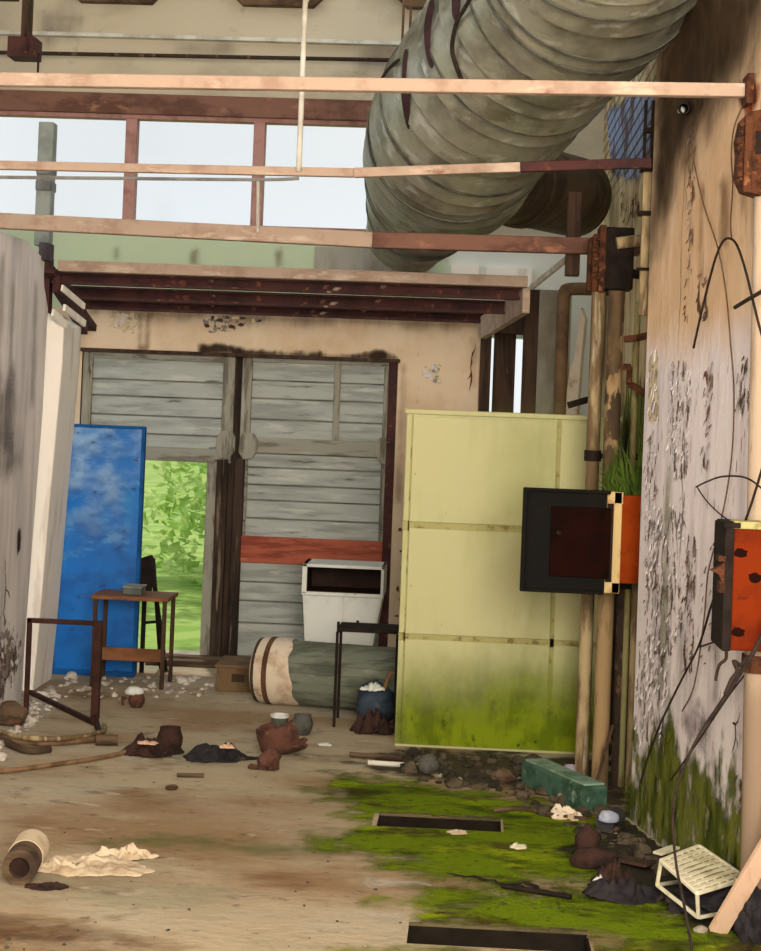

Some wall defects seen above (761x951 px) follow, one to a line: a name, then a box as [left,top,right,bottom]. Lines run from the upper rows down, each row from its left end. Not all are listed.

peeling [198,315,262,333]
peeling [735,356,750,420]
peeling [634,349,713,747]
flaking render [0,620,22,700]
damp [343,748,529,795]
damp [548,757,575,766]
damp [599,760,683,889]
damp [689,918,714,927]